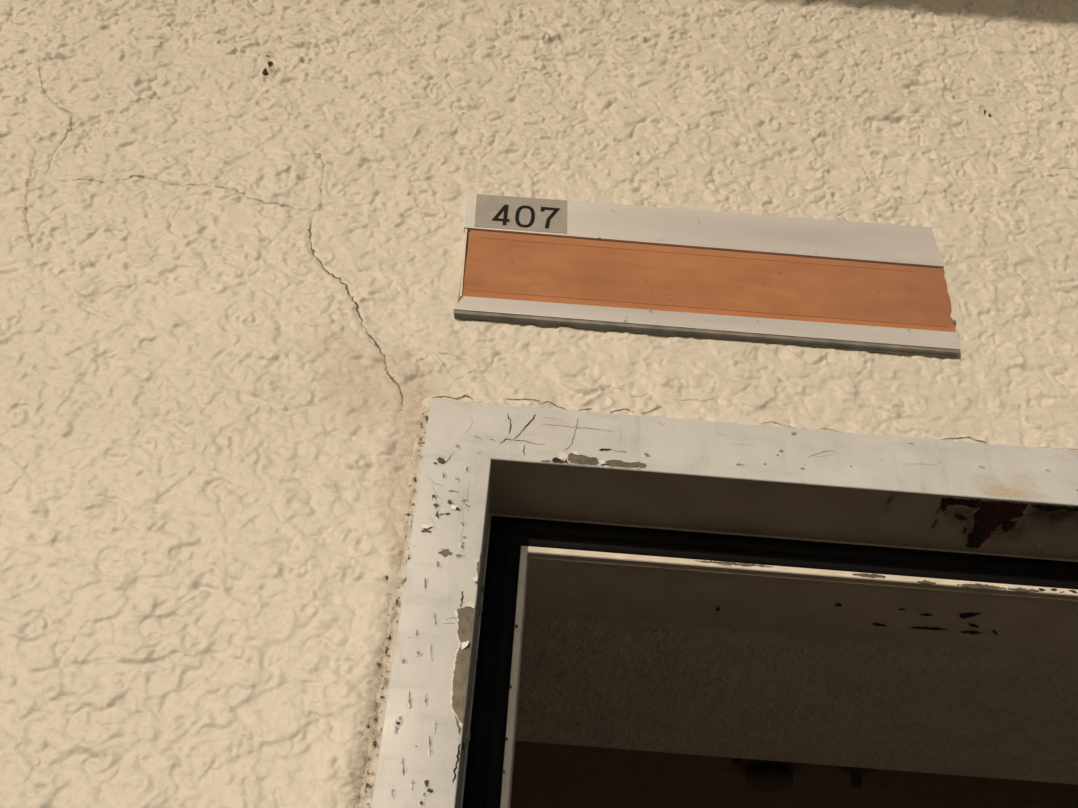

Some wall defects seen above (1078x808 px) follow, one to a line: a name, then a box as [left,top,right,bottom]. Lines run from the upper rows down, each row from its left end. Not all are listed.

crack [23,57,403,405]
crack [432,394,661,456]
peeling [538,447,651,470]
peeling [420,444,485,589]
rust [932,487,1028,549]
peeling [401,628,435,665]
peeling [897,607,1000,636]
peeling [393,690,429,734]
peeling [432,591,483,783]
peeling [400,756,436,808]